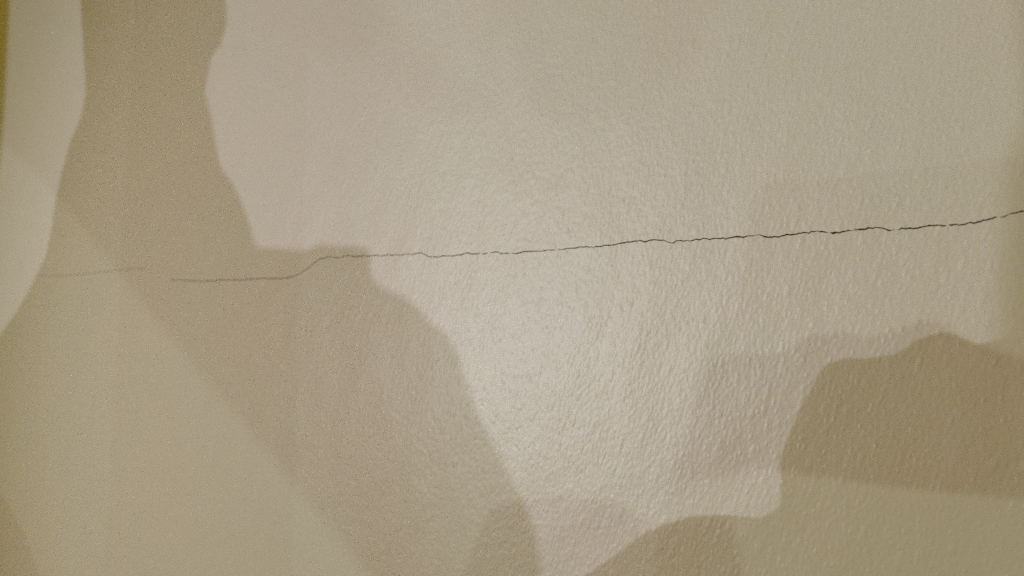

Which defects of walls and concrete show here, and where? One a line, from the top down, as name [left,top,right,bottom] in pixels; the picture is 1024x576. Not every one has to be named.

crack [176,210,1024,282]